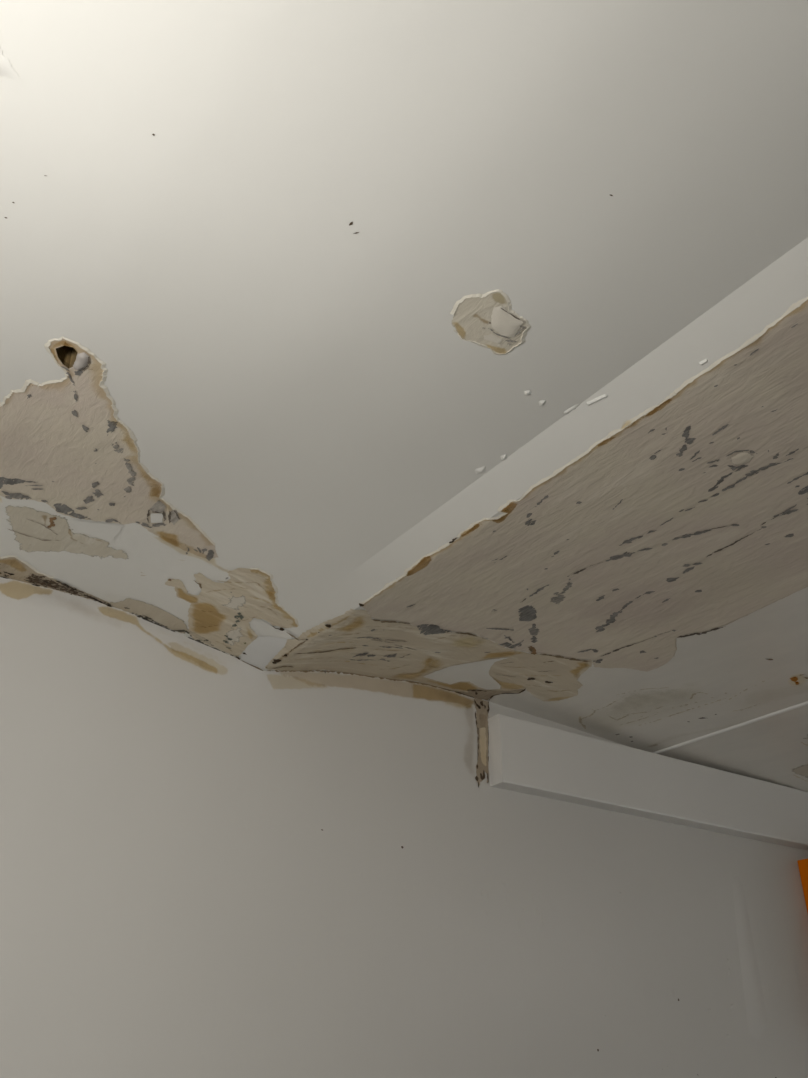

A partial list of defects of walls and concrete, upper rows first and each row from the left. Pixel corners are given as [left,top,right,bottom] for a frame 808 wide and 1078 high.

water stain [0,572,111,607]
peeling [0,336,218,561]
water stain [124,607,237,658]
peeling [165,289,808,702]